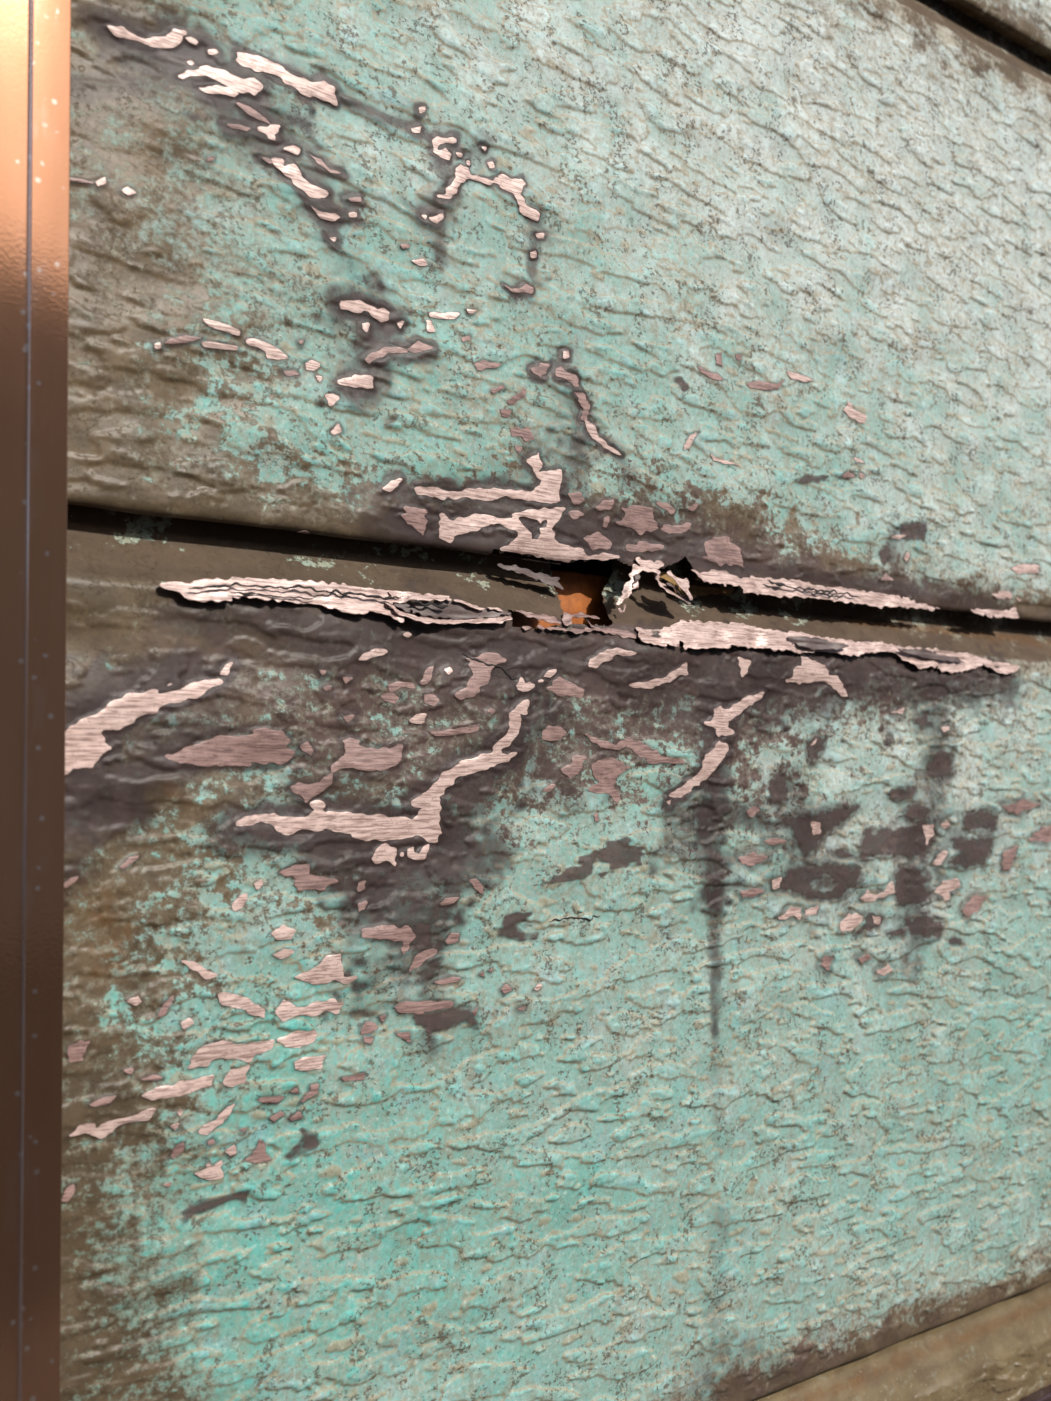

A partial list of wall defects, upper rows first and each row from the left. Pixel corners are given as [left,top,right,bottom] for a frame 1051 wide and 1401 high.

peeling [101,20,367,251]
peeling [154,292,477,406]
peeling [378,346,940,611]
leakage [65,650,203,731]
leakage [64,722,207,847]
peeling [65,652,240,777]
peeling [159,577,561,638]
peeling [236,648,584,867]
leakage [171,598,1026,1034]
peeling [542,620,1019,812]
peeling [734,777,1051,945]
peeling [67,950,357,1180]